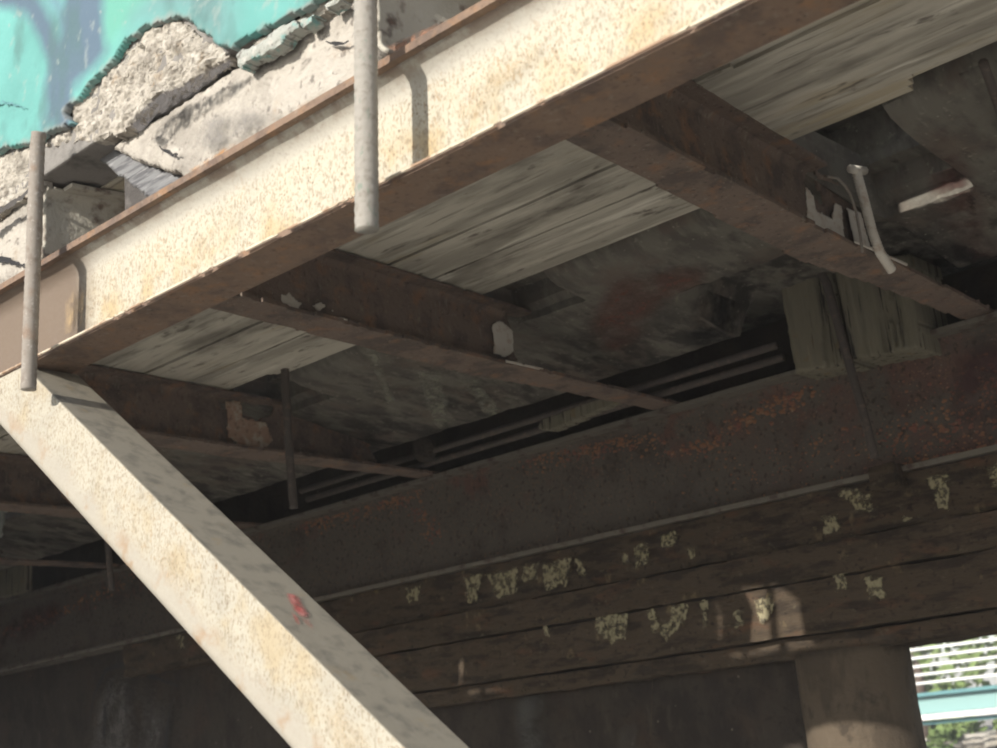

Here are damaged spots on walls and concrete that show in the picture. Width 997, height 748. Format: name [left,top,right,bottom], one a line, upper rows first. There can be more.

spalling [46,0,354,148]
crack [0,190,28,213]
spalling [0,148,30,221]
peeling [805,187,875,252]
crack [0,256,25,266]
peeling [281,292,333,311]
peeling [492,321,543,370]
peeling [225,400,273,448]